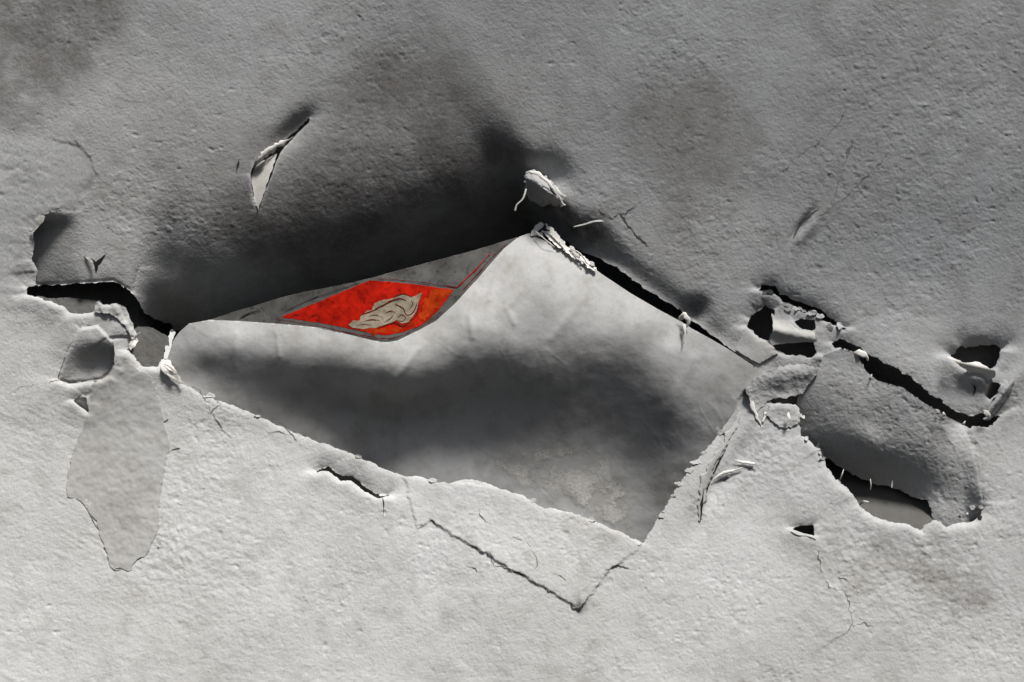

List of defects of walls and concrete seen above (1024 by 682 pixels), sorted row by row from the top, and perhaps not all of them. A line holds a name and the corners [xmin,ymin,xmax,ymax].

peeling [27,209,184,571]
spalling [735,305,817,363]
spalling [832,339,859,357]
spalling [948,344,1015,416]
crack [317,467,389,514]
spalling [825,458,985,530]
crack [422,520,629,611]